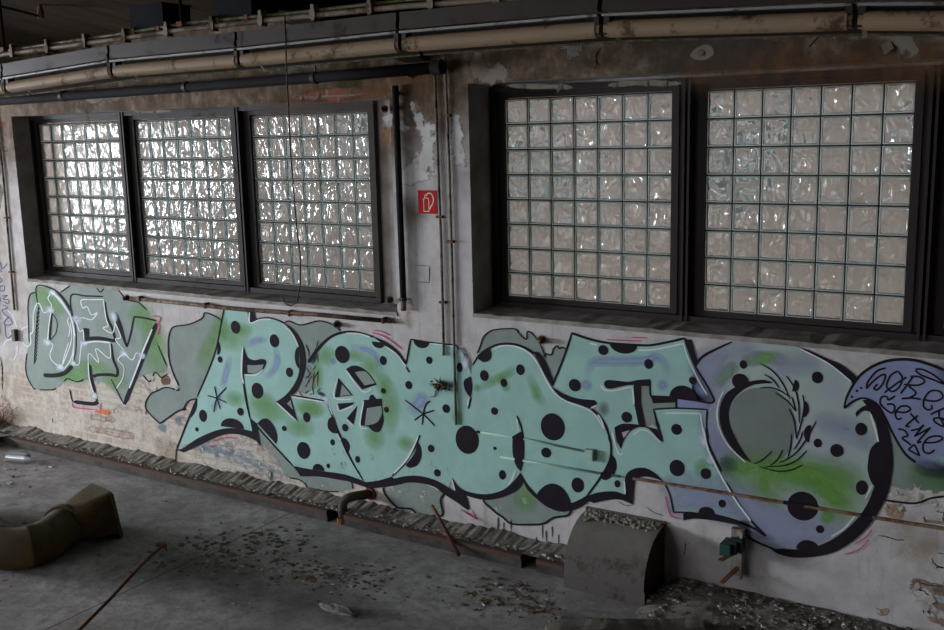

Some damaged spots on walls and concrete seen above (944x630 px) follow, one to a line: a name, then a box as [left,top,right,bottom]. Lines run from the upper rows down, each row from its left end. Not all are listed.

flaking render [690,44,714,60]
peeling [829,30,919,58]
peeling [383,101,468,186]
peeling [884,479,944,525]
flaking render [910,572,944,627]